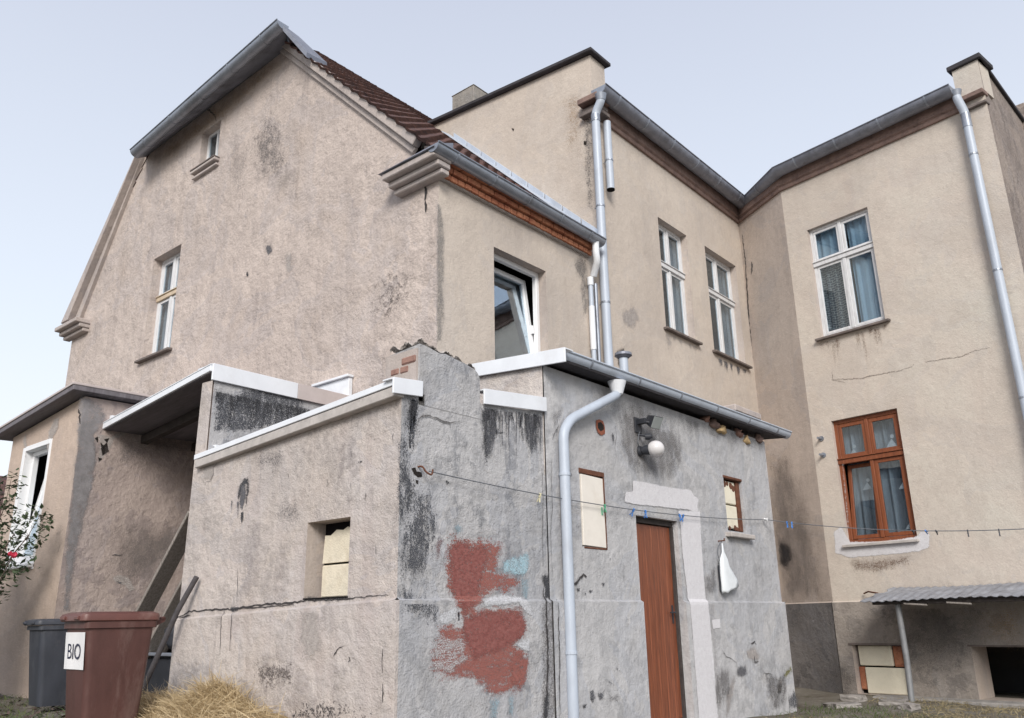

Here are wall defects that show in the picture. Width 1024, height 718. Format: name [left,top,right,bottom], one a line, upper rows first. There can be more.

damp [213,389,309,437]
damp [480,407,542,471]
peeling [63,397,125,614]
damp [231,477,249,522]
damp [390,399,443,627]